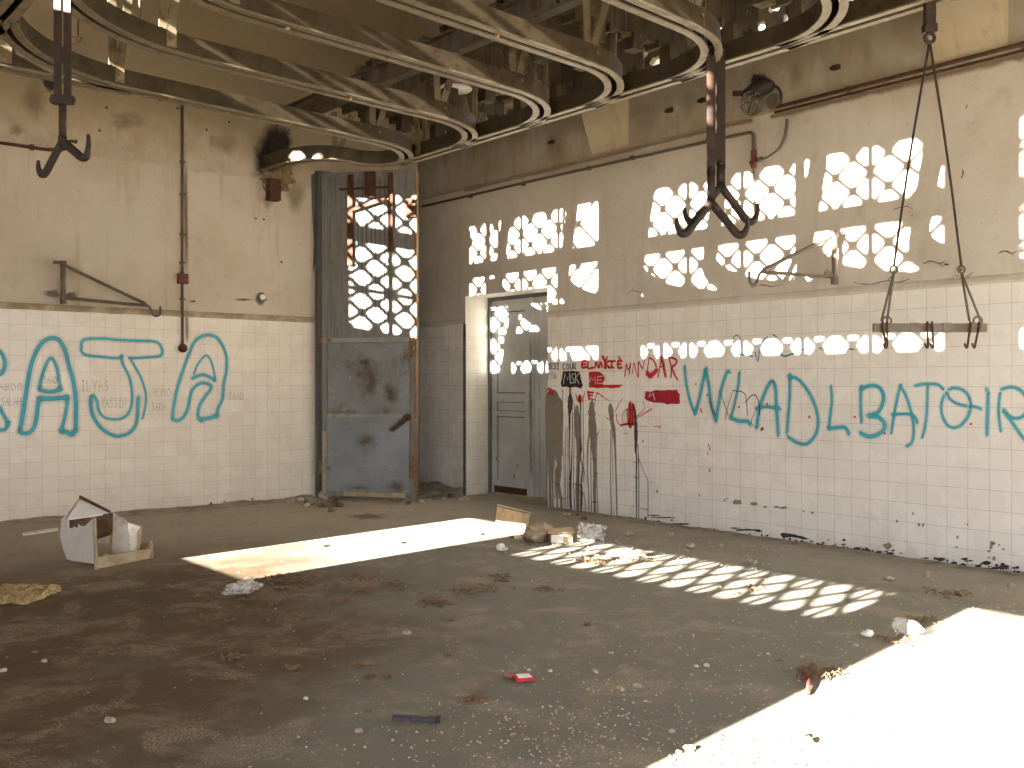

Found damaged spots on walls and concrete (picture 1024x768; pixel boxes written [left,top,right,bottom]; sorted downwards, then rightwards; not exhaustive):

flaking render [259,166,296,192]
spalling [732,527,902,555]
spalling [922,536,1024,573]